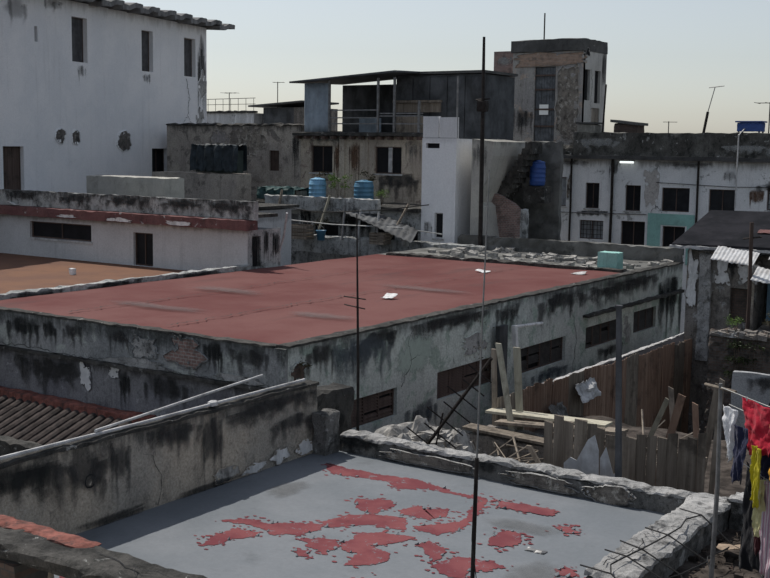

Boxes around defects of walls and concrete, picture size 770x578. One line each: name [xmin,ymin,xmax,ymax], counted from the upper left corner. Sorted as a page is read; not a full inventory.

spalling [54,128,81,145]
spalling [116,130,132,152]
leakage [538,274,682,328]
leakage [7,317,81,345]
peeling [79,362,92,392]
peeling [102,334,174,379]
leakage [306,330,396,375]
leakage [149,390,318,471]
leakage [340,437,379,451]
leakage [0,446,131,501]
spalling [498,470,636,506]
peeling [194,463,581,578]